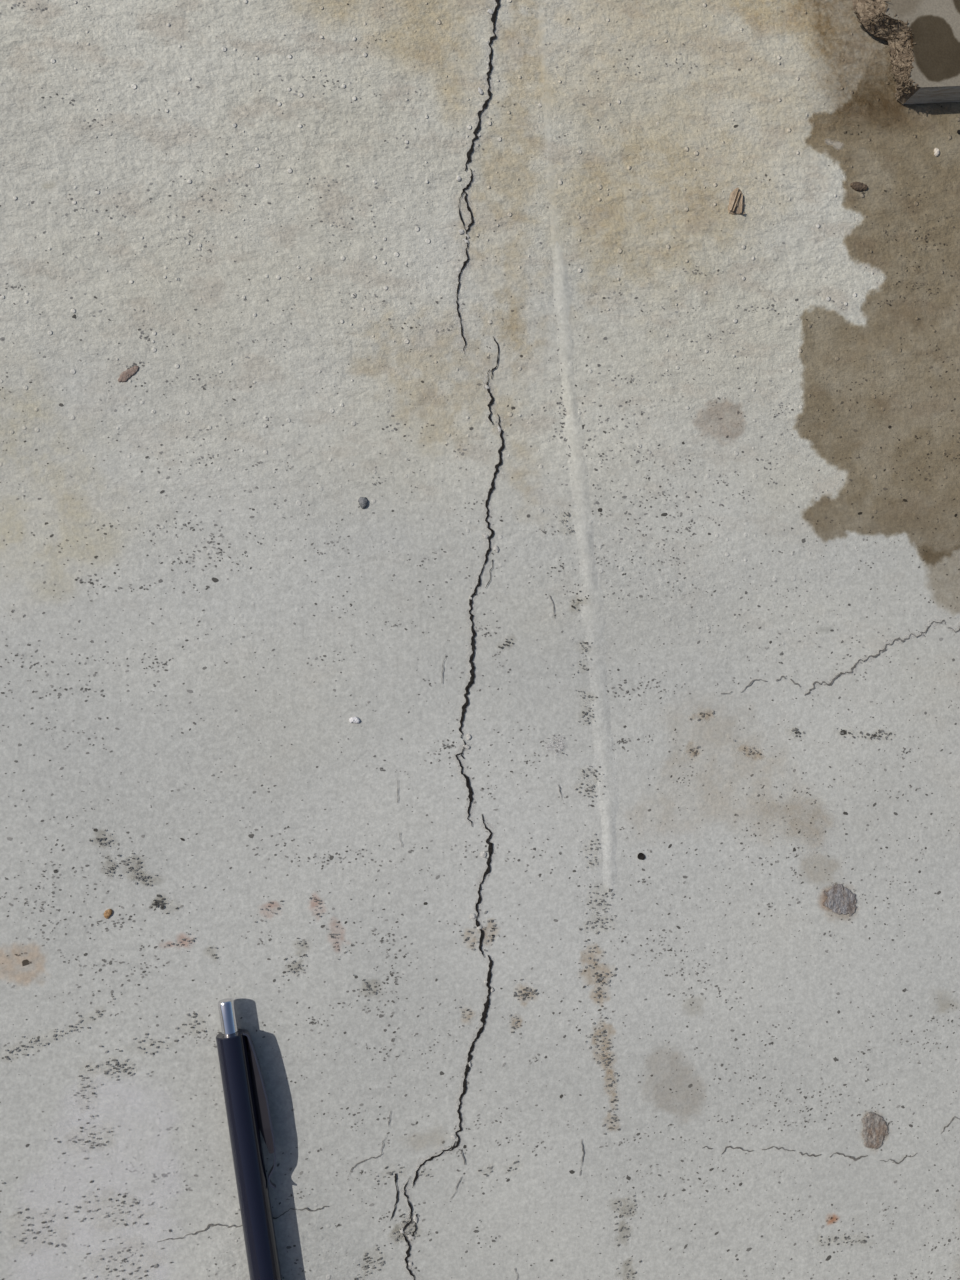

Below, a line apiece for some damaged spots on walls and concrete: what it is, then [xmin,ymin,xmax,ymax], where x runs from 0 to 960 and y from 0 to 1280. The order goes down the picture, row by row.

crack [348,0,504,1280]
crack [721,620,960,696]
crack [158,1224,242,1242]
crack [273,1206,328,1219]